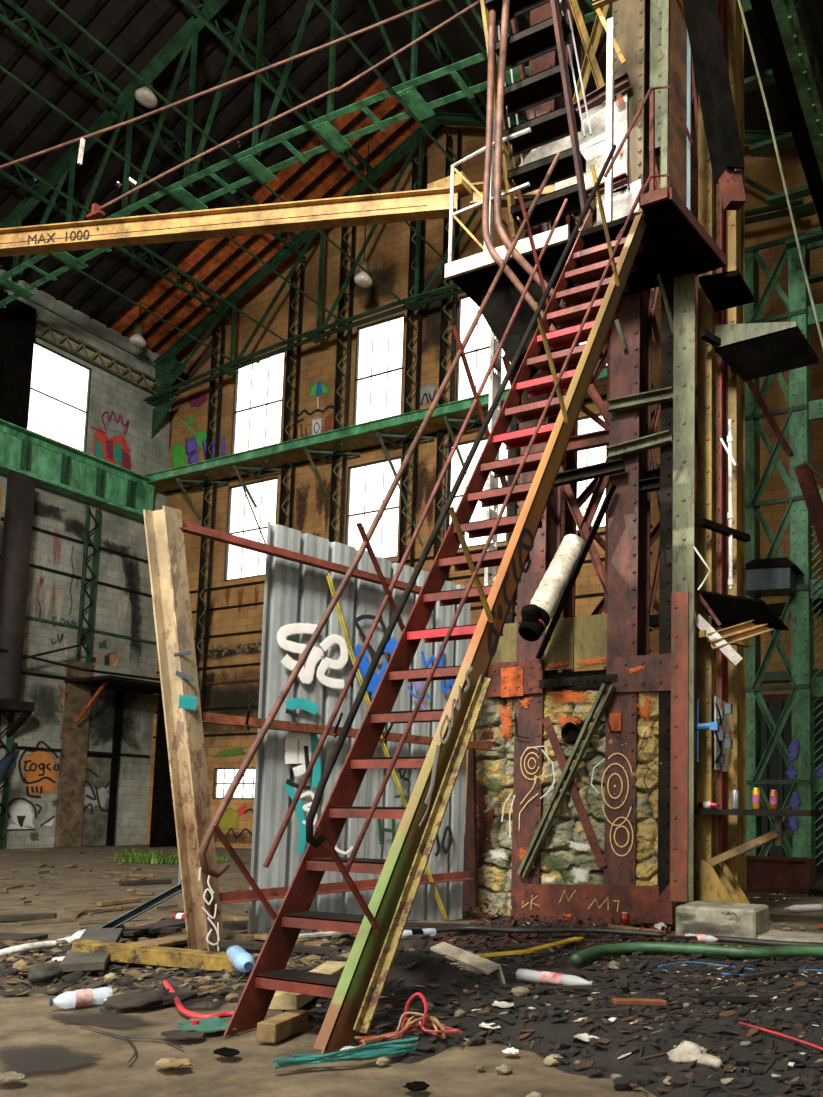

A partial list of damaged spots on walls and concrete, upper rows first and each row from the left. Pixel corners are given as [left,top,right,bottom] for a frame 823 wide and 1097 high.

leakage [34,502,85,540]
leakage [104,540,141,658]
leakage [25,589,87,661]
corrosion [546,657,606,670]
corrosion [498,698,530,739]
corrosion [547,689,588,726]
corrosion [636,696,652,721]